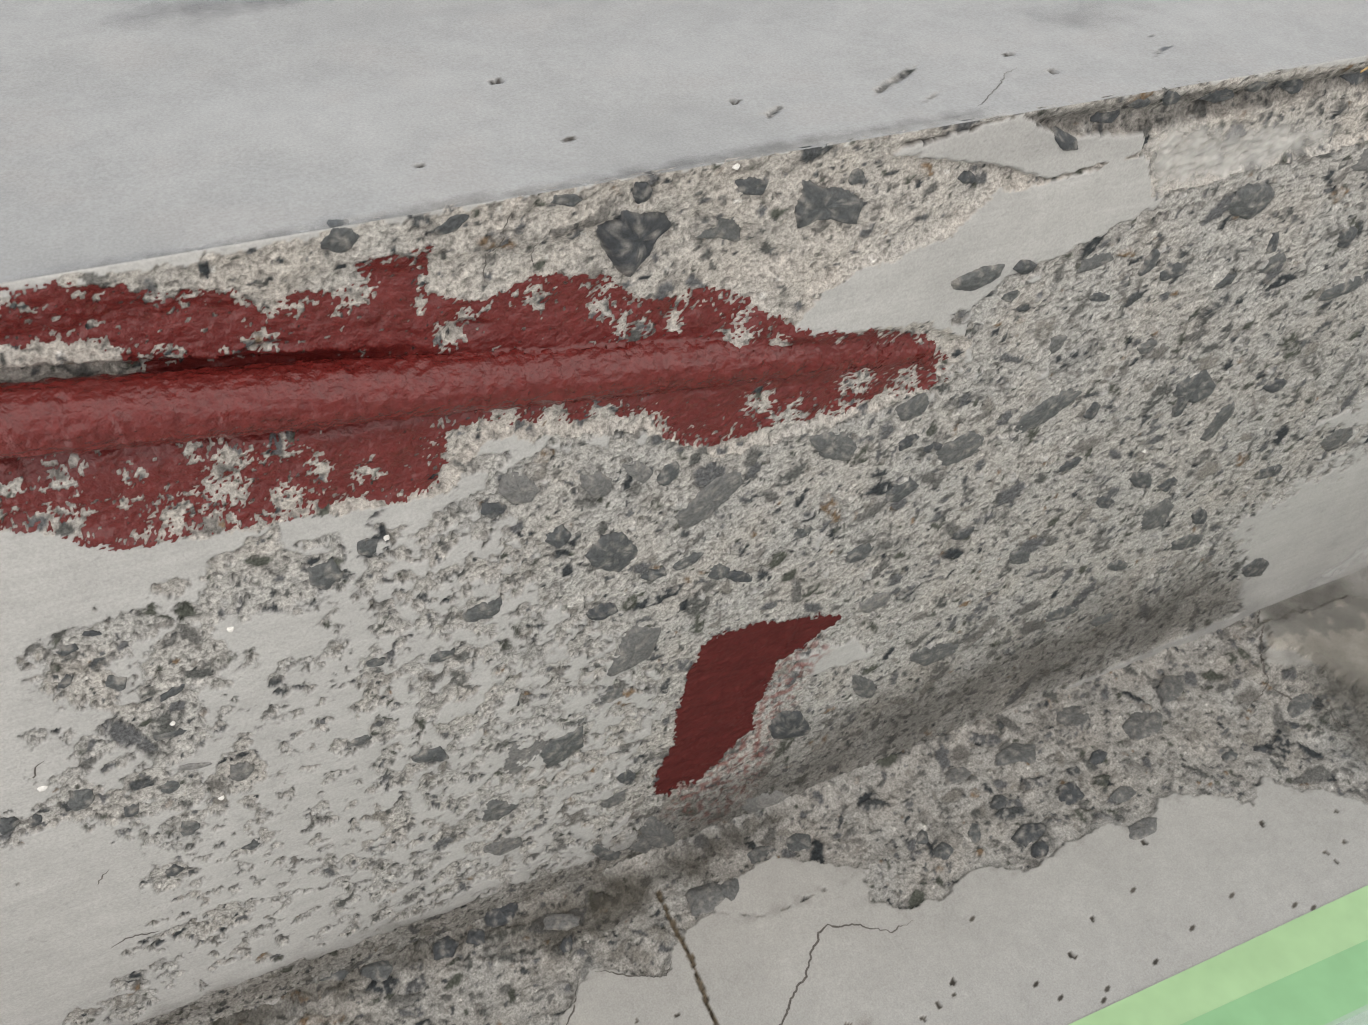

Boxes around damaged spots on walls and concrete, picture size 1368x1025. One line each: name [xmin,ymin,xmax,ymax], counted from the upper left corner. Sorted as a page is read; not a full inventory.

spalling [1024,60,1368,198]
spalling [0,114,1043,543]
spalling [122,140,1368,1025]
spalling [33,606,264,904]
crack [566,961,672,1025]
crack [779,921,911,1025]